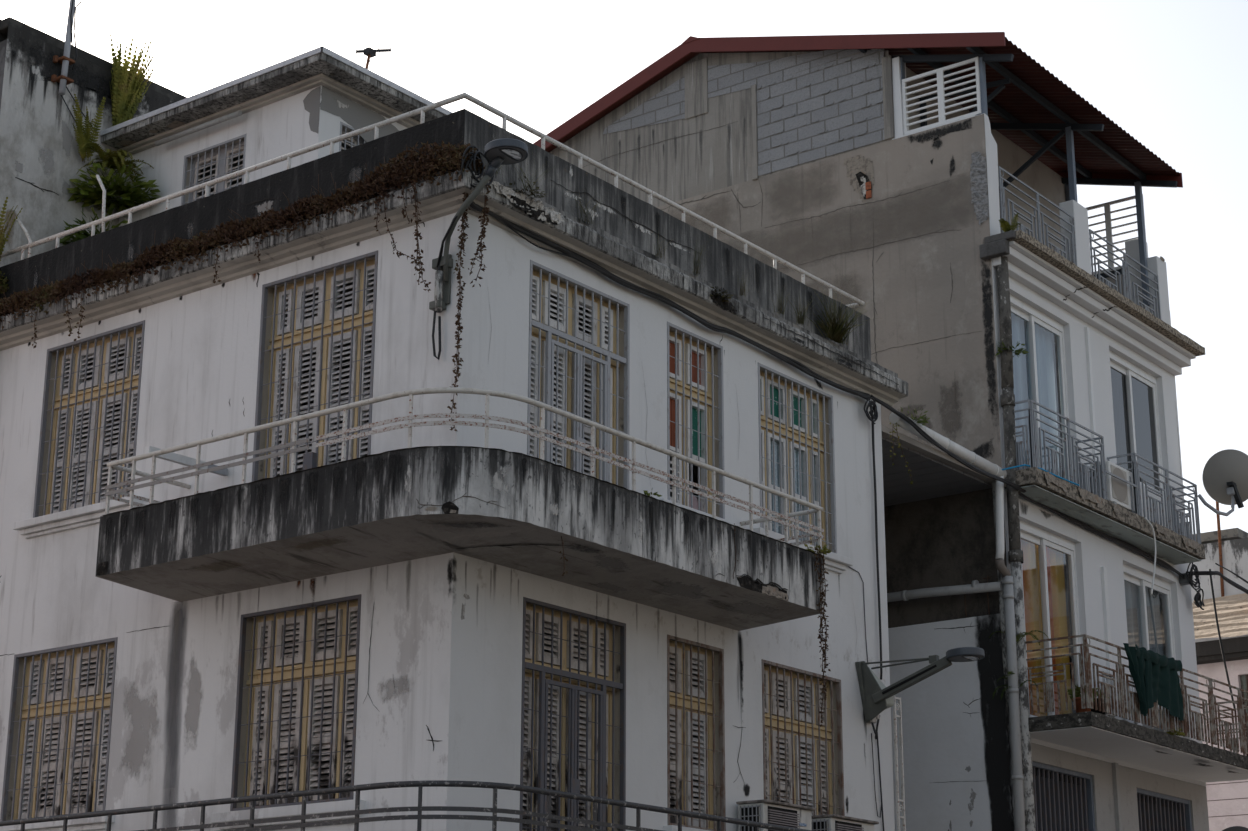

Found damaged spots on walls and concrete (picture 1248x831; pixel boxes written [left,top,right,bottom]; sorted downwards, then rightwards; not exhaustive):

damp [10,43,113,112]
crack [15,177,58,195]
damp [567,193,659,234]
damp [333,454,411,498]
crack [416,493,504,508]
damp [447,560,456,592]
spalling [736,574,789,601]
damp [165,602,186,828]